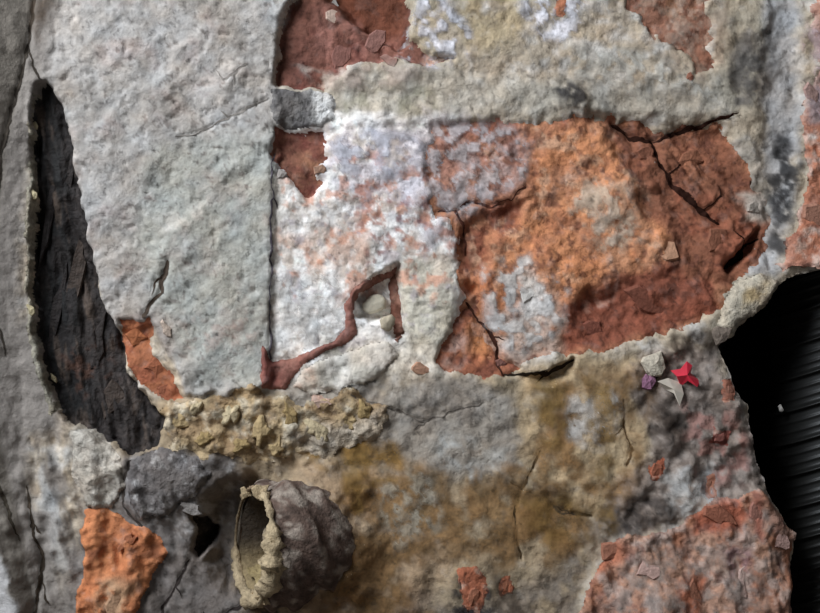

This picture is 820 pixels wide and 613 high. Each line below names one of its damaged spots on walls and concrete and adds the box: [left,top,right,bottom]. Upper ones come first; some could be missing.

spalling [275,0,453,92]
damp [416,0,471,67]
damp [521,0,580,40]
crack [437,186,526,255]
spalling [411,113,771,380]
crack [610,113,758,269]
flaking render [260,267,404,413]
crack [465,302,574,382]
damp [568,396,605,440]
crack [0,485,49,613]
damp [381,473,437,545]
spalling [579,473,796,613]